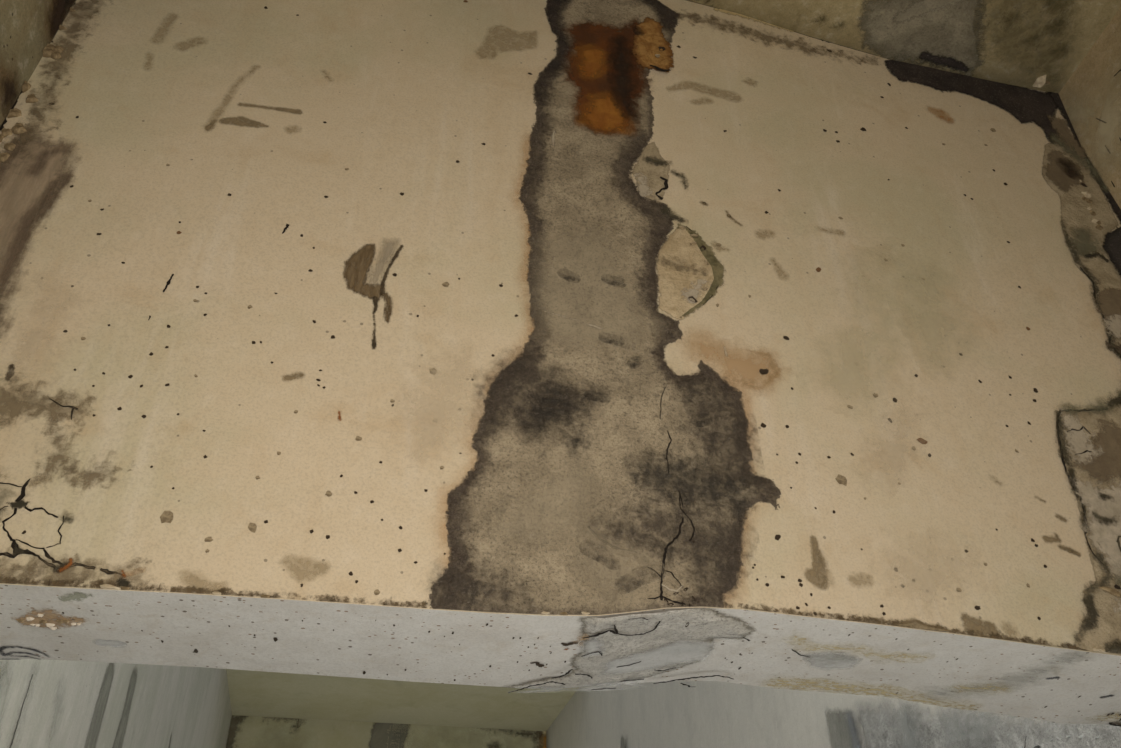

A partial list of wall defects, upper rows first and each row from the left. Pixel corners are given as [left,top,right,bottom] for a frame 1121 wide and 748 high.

leakage [0,133,71,324]
leakage [436,0,602,610]
corrosion [563,19,652,135]
leakage [643,0,679,30]
flaking render [633,142,724,320]
leakage [597,132,776,604]
leakage [885,0,1121,275]
peeling [1042,115,1121,358]
crack [0,479,130,587]
crack [583,387,696,639]
peeling [1056,392,1121,655]